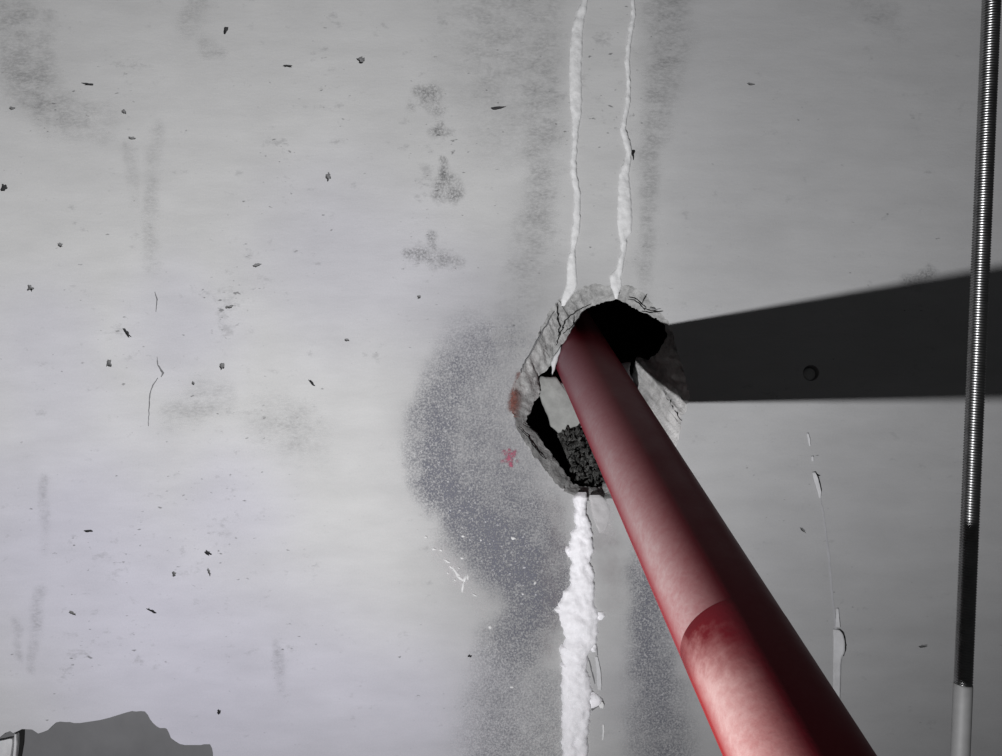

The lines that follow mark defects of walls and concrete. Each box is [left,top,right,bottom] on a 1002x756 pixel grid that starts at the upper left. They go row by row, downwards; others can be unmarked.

damp [561,0,588,306]
damp [610,0,636,299]
spalling [510,283,690,501]
damp [411,343,611,756]
crack [807,433,847,698]